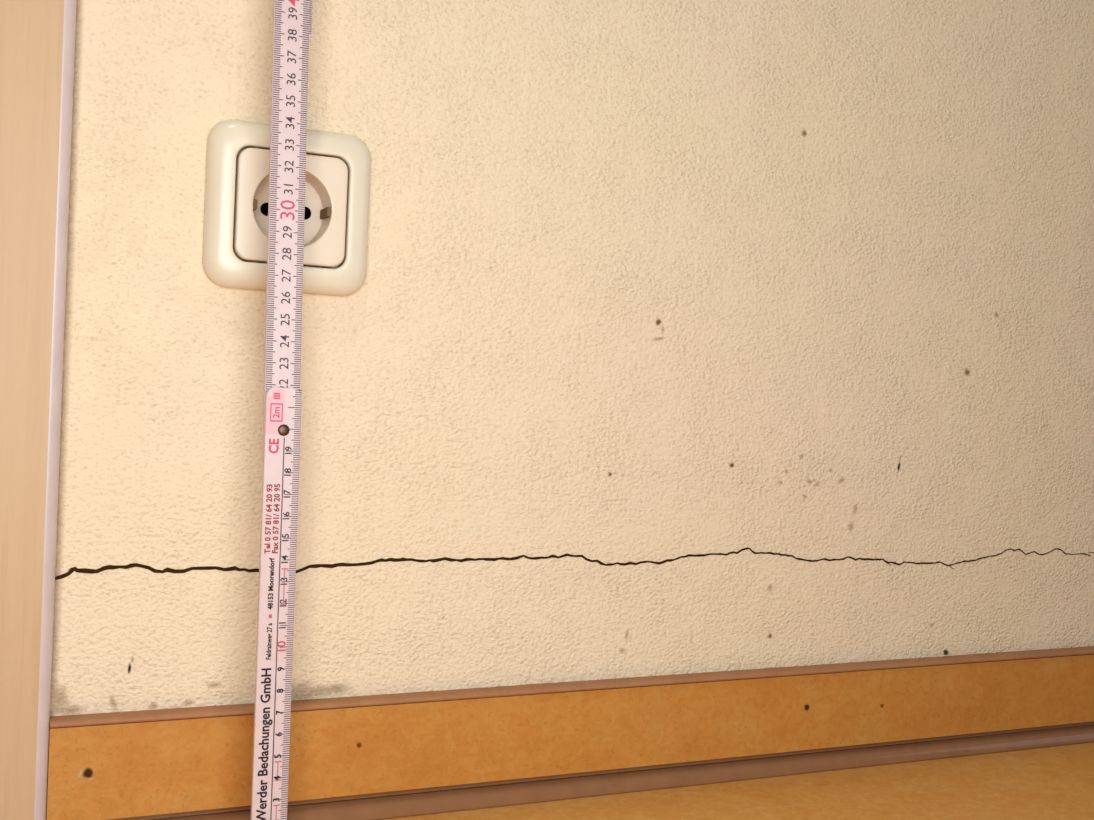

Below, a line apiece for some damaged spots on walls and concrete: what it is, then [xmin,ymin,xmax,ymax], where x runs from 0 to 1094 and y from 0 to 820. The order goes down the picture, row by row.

crack [55,563,259,580]
crack [296,548,1094,573]